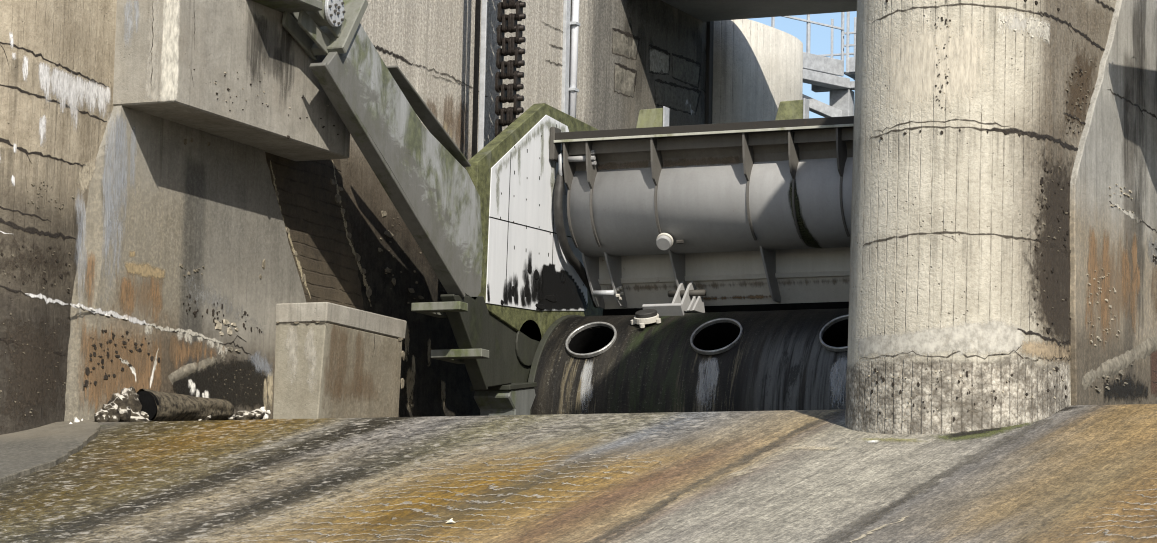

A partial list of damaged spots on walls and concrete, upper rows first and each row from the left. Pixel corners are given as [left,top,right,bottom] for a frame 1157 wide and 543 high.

crack [872,0,1115,51]
crack [0,42,109,127]
water stain [9,33,110,124]
crack [1108,89,1157,119]
crack [0,138,86,167]
crack [870,113,1085,151]
crack [0,206,76,240]
crack [863,231,1052,248]
spalling [845,149,1072,434]
rust [1086,231,1140,339]
water stain [581,364,592,396]
water stain [697,361,718,402]